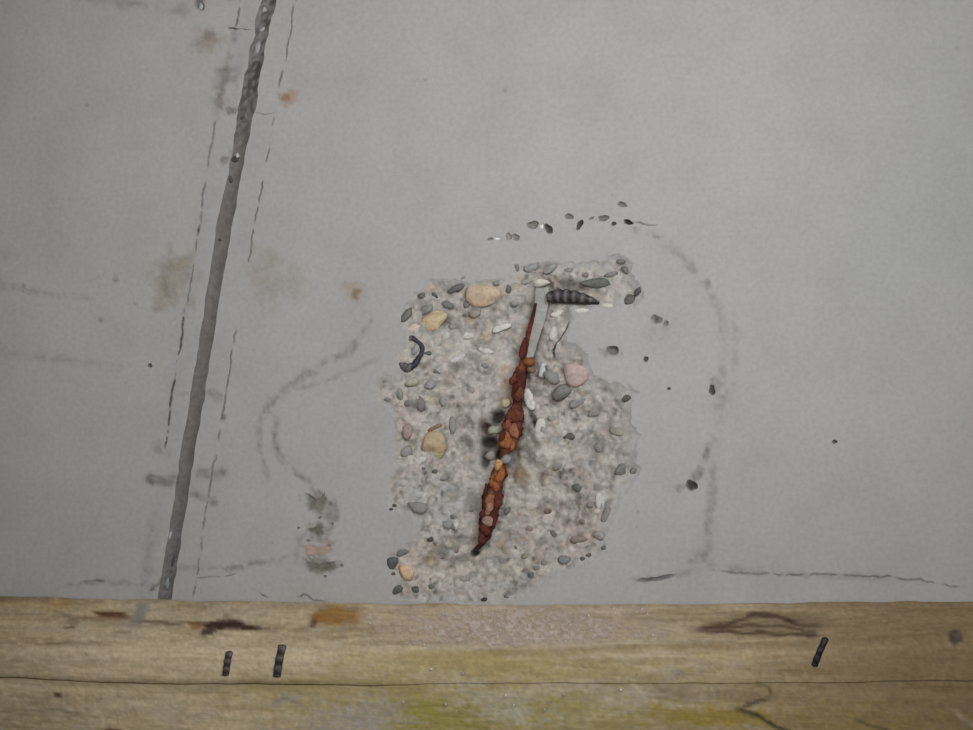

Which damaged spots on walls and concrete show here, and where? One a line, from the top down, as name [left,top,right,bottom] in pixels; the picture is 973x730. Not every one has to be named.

crack [165,380,176,443]
spalling [371,253,645,605]
corrosion [498,338,536,452]
corrosion [478,459,525,545]